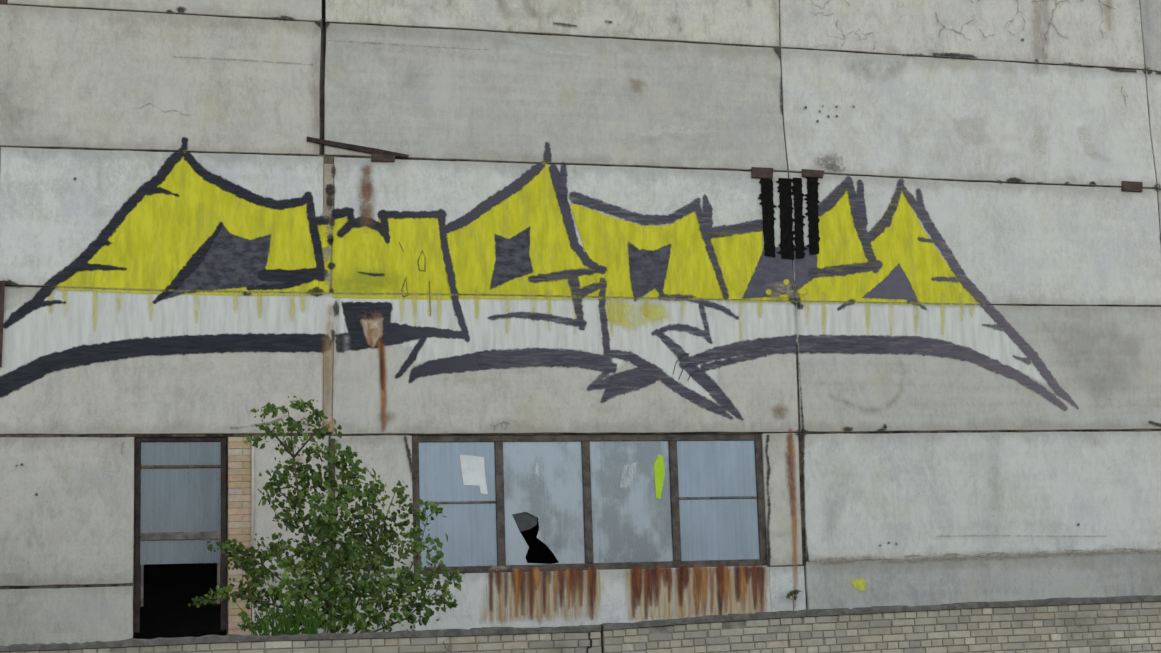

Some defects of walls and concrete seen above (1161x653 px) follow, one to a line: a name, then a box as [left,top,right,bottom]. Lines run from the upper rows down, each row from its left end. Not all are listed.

corrosion [361,167,372,222]
corrosion [377,337,389,430]
corrosion [786,430,797,572]
corrosion [485,568,600,621]
corrosion [627,566,765,620]